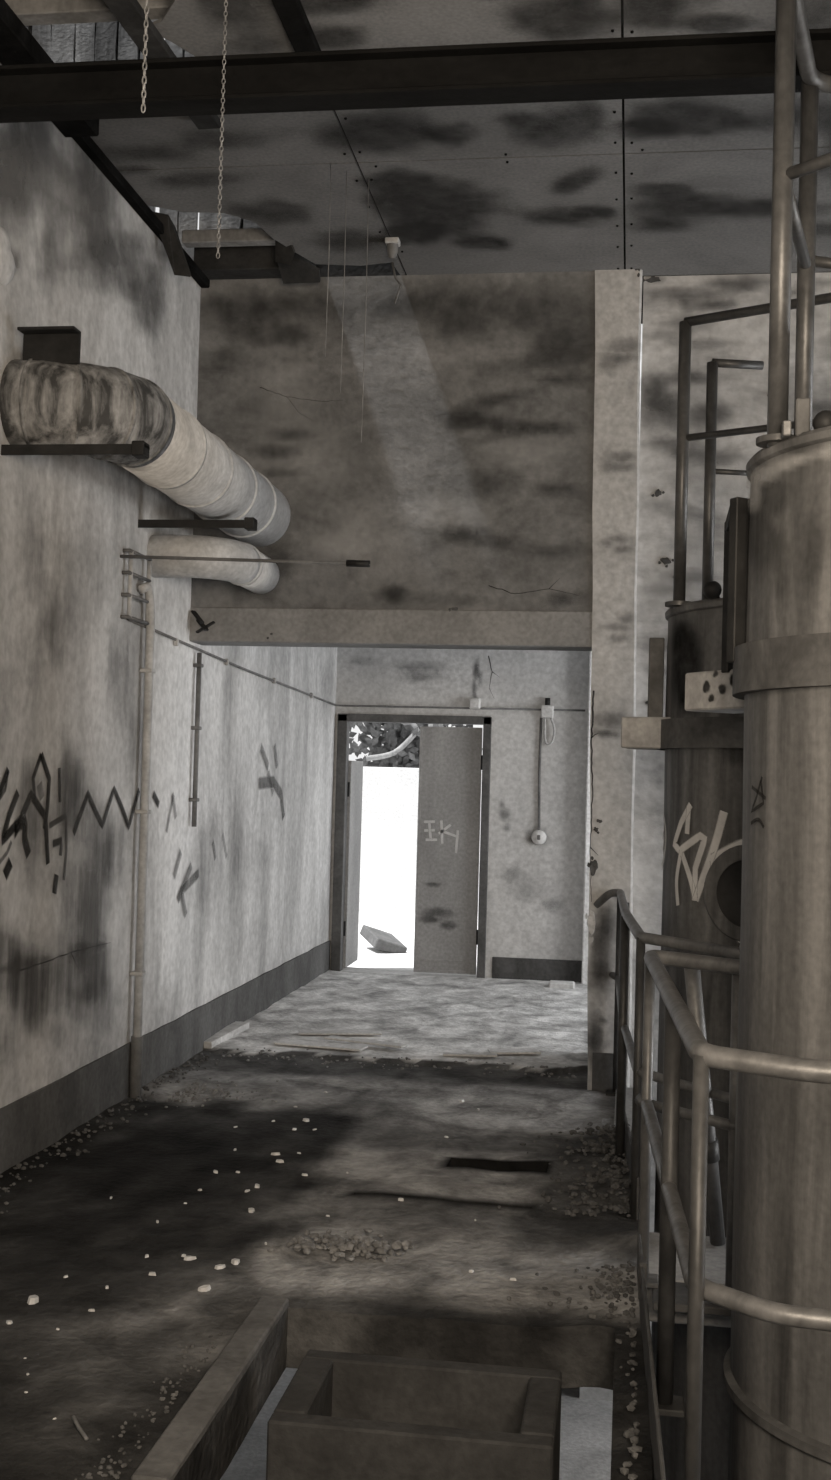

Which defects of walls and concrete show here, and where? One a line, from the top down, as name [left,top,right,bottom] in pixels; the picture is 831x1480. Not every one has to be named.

damp [300,0,370,46]
damp [515,0,606,38]
damp [625,0,745,31]
damp [327,116,464,150]
damp [624,104,746,136]
damp [556,172,594,192]
damp [364,172,507,248]
damp [535,209,613,224]
damp [645,185,772,229]
damp [78,831,114,995]
damp [7,952,60,1016]